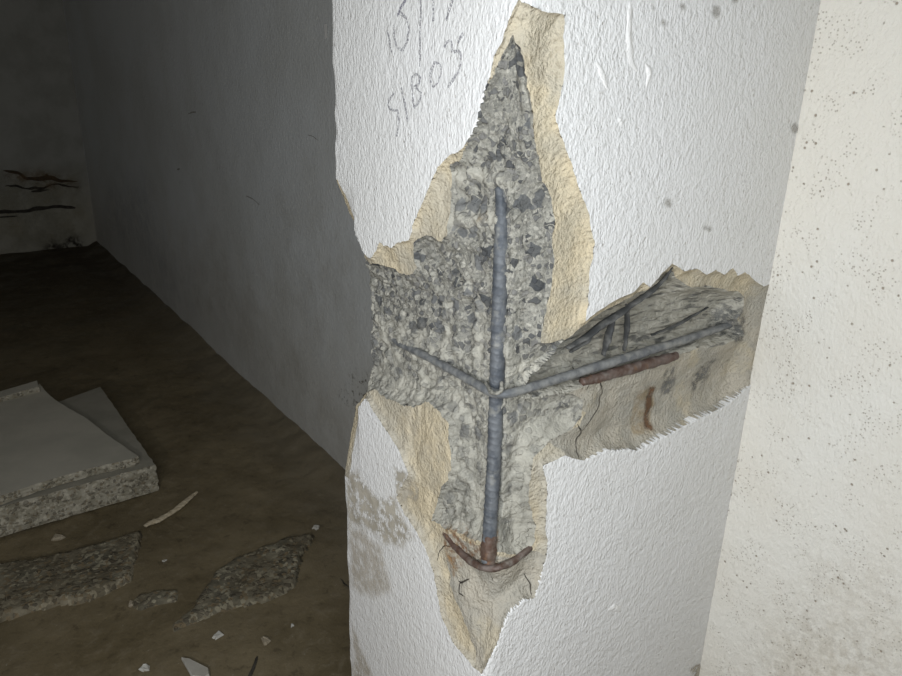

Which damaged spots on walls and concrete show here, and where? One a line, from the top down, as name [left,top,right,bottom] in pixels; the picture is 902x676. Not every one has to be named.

crack [0,170,77,218]
spalling [345,0,769,674]
rust [579,352,679,386]
rust [644,388,655,430]
rust [442,527,533,573]